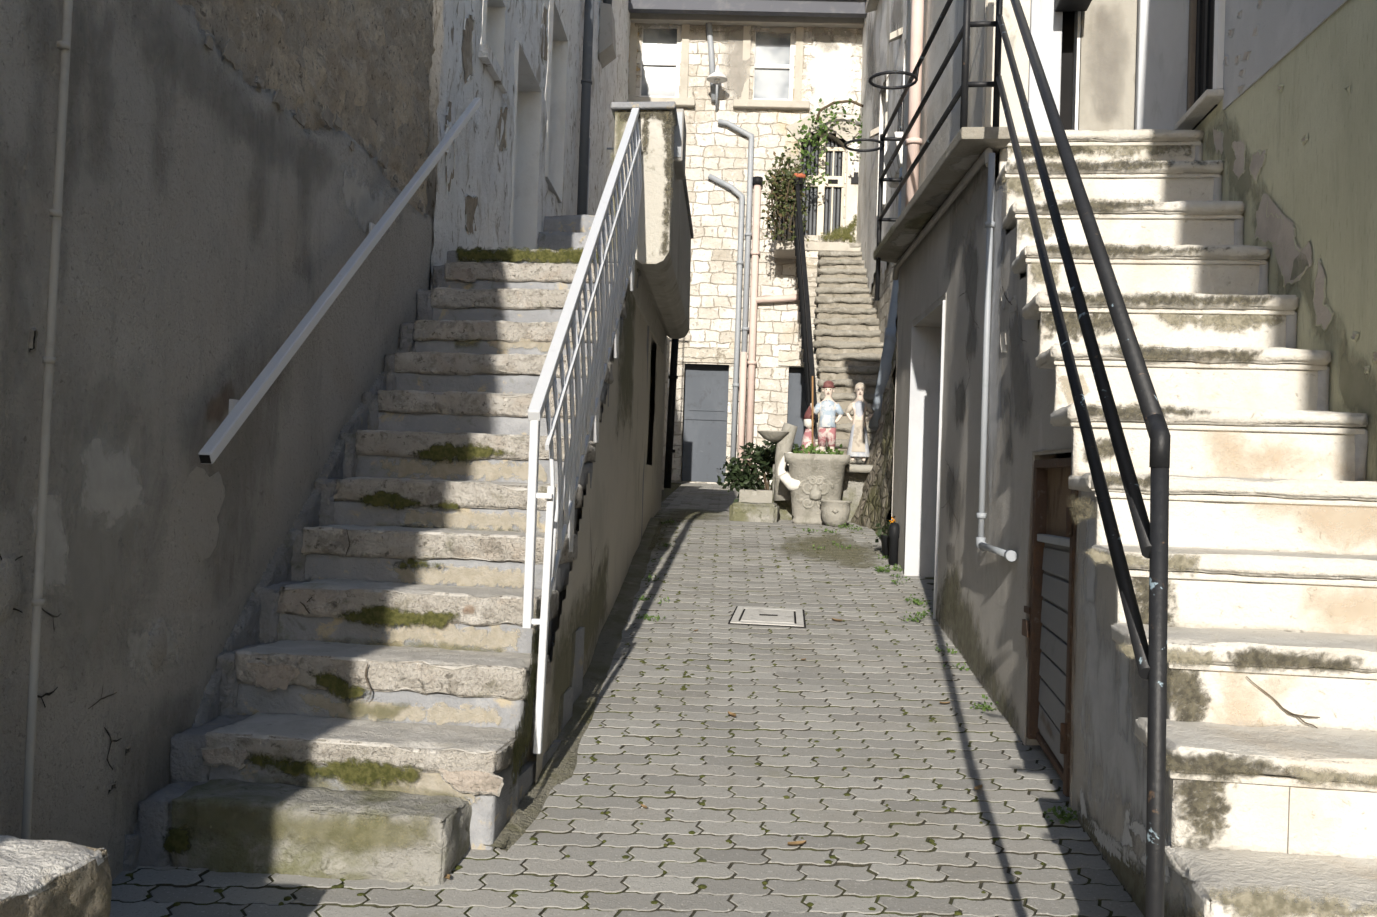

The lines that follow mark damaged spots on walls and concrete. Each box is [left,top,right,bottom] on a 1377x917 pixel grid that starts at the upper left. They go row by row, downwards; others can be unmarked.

flaking render [175,0,478,236]
leakage [948,175,1003,502]
peeling [1213,127,1335,332]
crack [1246,676,1320,728]